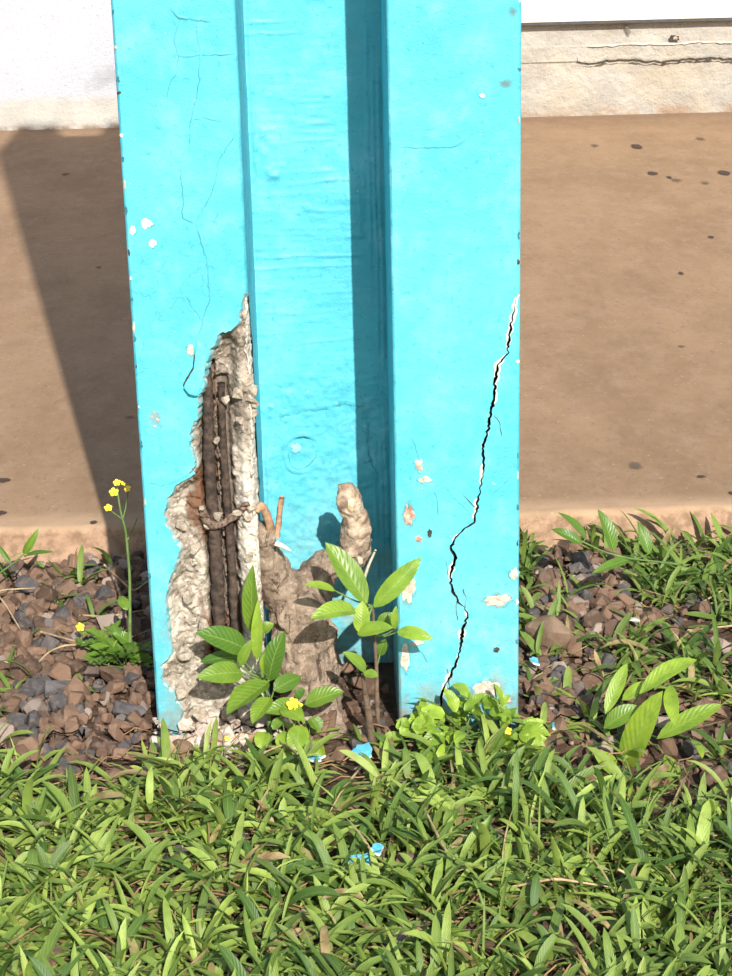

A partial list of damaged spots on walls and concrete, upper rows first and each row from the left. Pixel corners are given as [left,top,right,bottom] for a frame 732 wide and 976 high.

crack [170,9,239,339]
peeling [413,458,435,484]
rust [187,460,218,541]
spalling [160,292,267,737]
peeling [404,503,416,525]
crack [420,294,520,706]
peeling [402,576,418,603]
peeling [481,592,519,607]
peeling [508,568,520,582]
peeling [400,640,424,676]